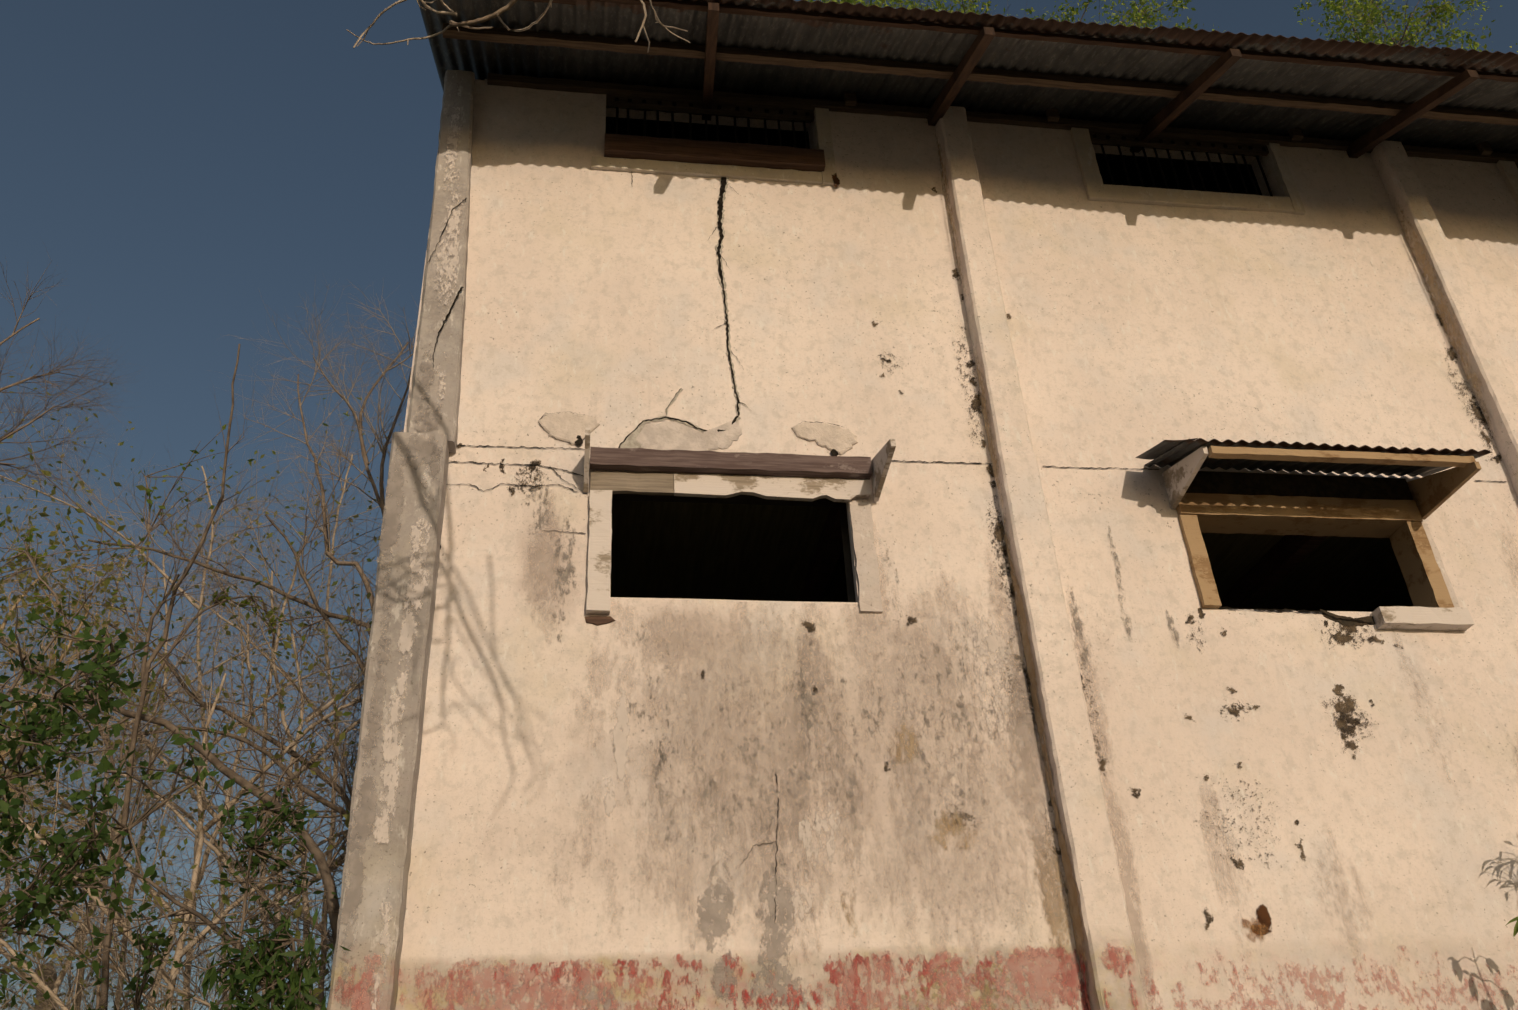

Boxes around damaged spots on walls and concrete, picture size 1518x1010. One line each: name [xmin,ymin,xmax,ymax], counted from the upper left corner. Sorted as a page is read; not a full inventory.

crack [446,177,750,492]
flaking render [621,420,742,451]
flaking render [791,421,858,456]
mould [1436,313,1502,463]
leakage [483,459,575,595]
leakage [897,326,1036,741]
peeling [335,350,446,1010]
flaking render [585,616,616,626]
flaking render [1217,607,1375,627]
leakage [934,791,981,830]
peeling [417,802,1518,1010]
leakage [1038,792,1068,922]